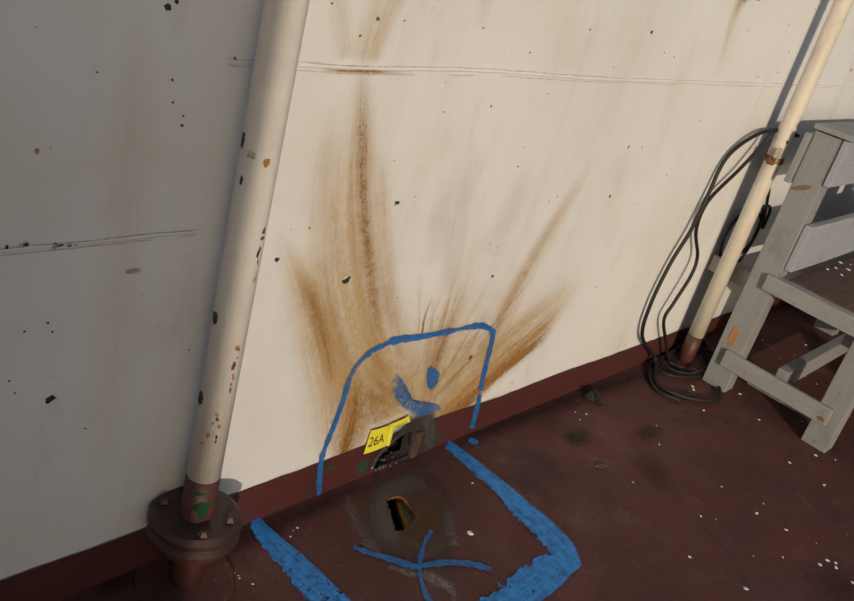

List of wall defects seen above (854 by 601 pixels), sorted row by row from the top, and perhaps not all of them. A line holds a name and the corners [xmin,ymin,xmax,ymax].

corrosion [301,211,407,455]
corrosion [434,317,548,417]
peeling [369,474,457,559]